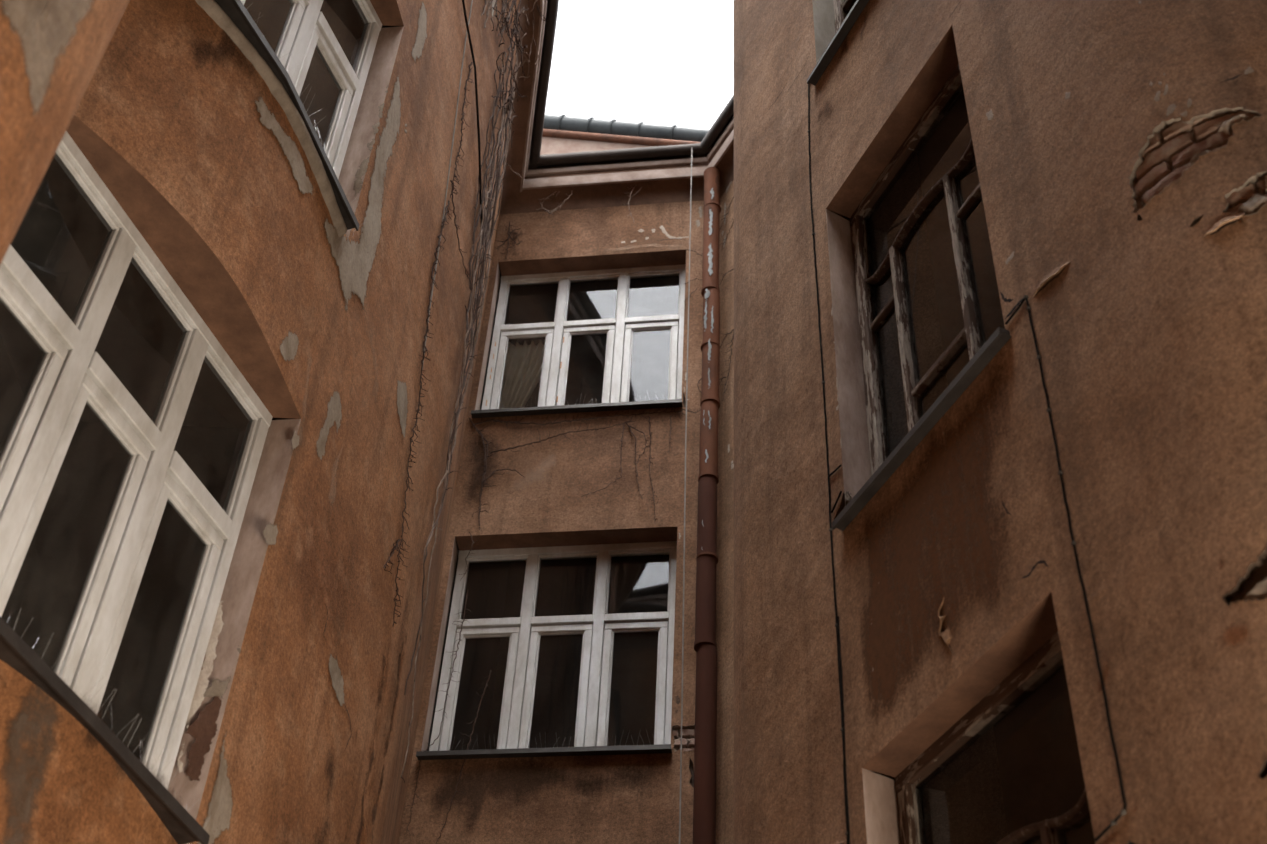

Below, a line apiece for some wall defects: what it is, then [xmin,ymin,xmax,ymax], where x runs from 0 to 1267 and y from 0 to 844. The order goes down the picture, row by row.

flaking render [2,0,92,114]
flaking render [1129,73,1262,221]
flaking render [1190,171,1267,237]
peeling [1032,261,1070,298]
water stain [860,367,1007,720]
spalling [1222,545,1267,606]
peeling [177,601,224,781]